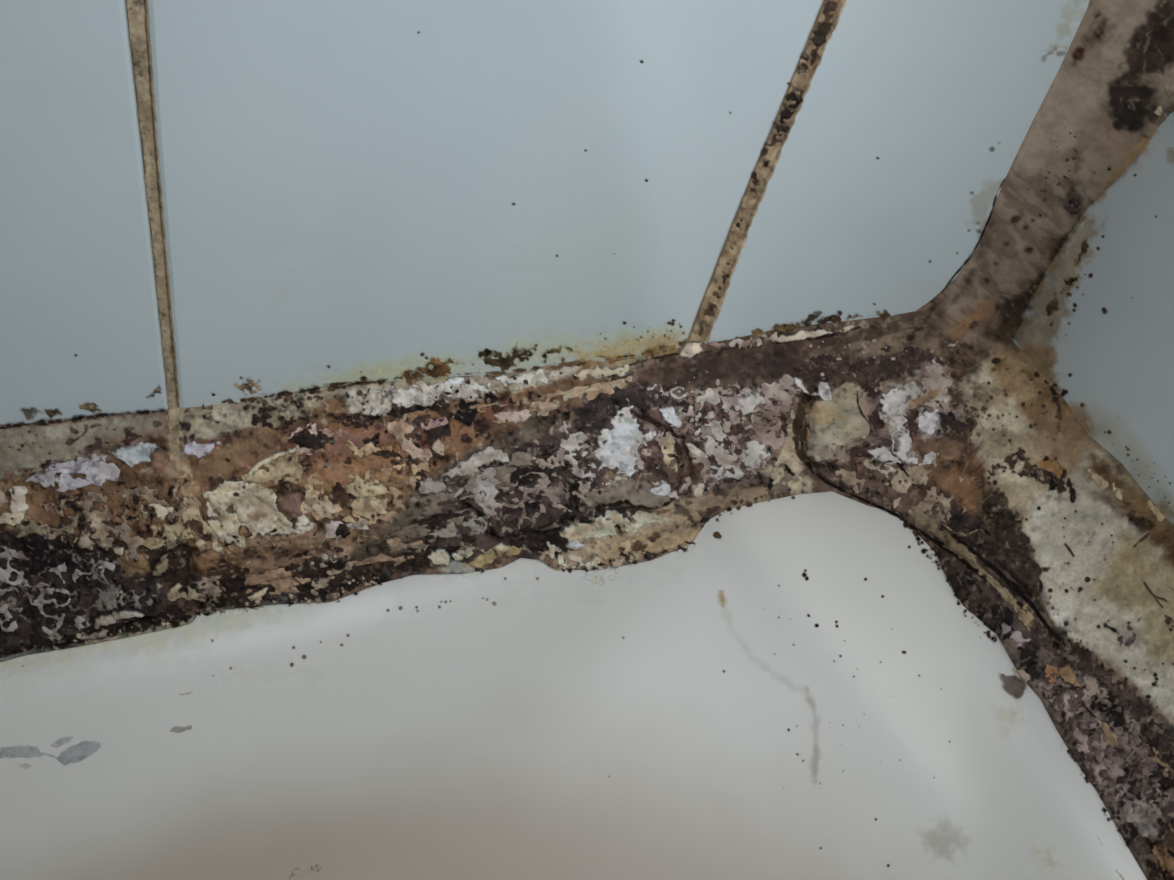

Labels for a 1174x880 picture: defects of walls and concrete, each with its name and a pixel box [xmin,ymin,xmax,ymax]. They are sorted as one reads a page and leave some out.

corrosion [1034,217,1089,327]
leakage [179,219,935,490]
leakage [0,482,476,667]
corrosion [197,429,287,478]
flaking render [0,341,1034,646]
leakage [477,446,590,534]
corrosion [912,435,981,510]
leakage [820,235,1174,880]
peeling [1087,469,1122,499]
corrosion [1129,499,1174,539]
peeling [1148,500,1164,521]
flaking render [1001,664,1174,876]